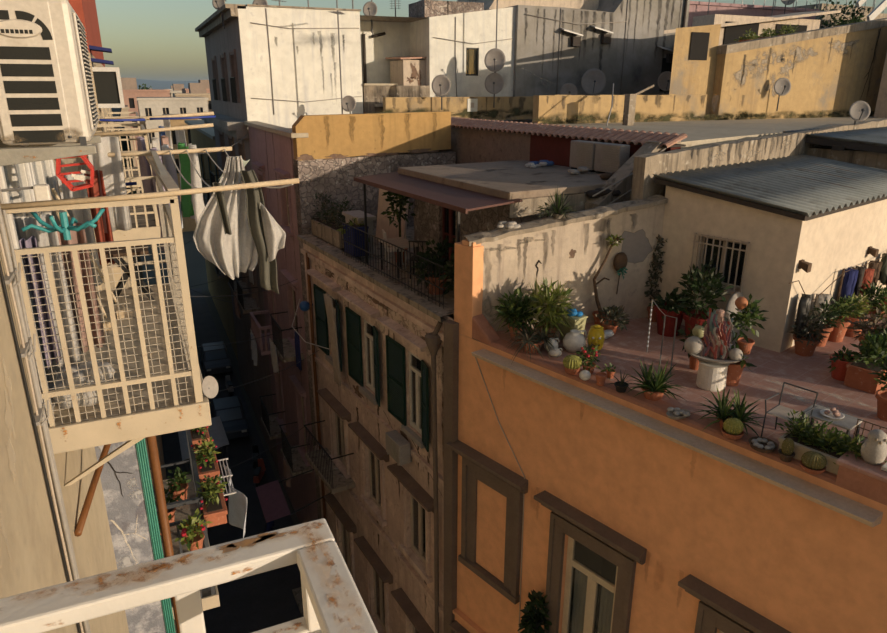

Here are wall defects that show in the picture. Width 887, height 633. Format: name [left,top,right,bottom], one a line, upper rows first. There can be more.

water stain [525,8,613,56]
flaking render [734,46,818,96]
corrosion [138,554,191,580]
corrosion [220,523,335,566]